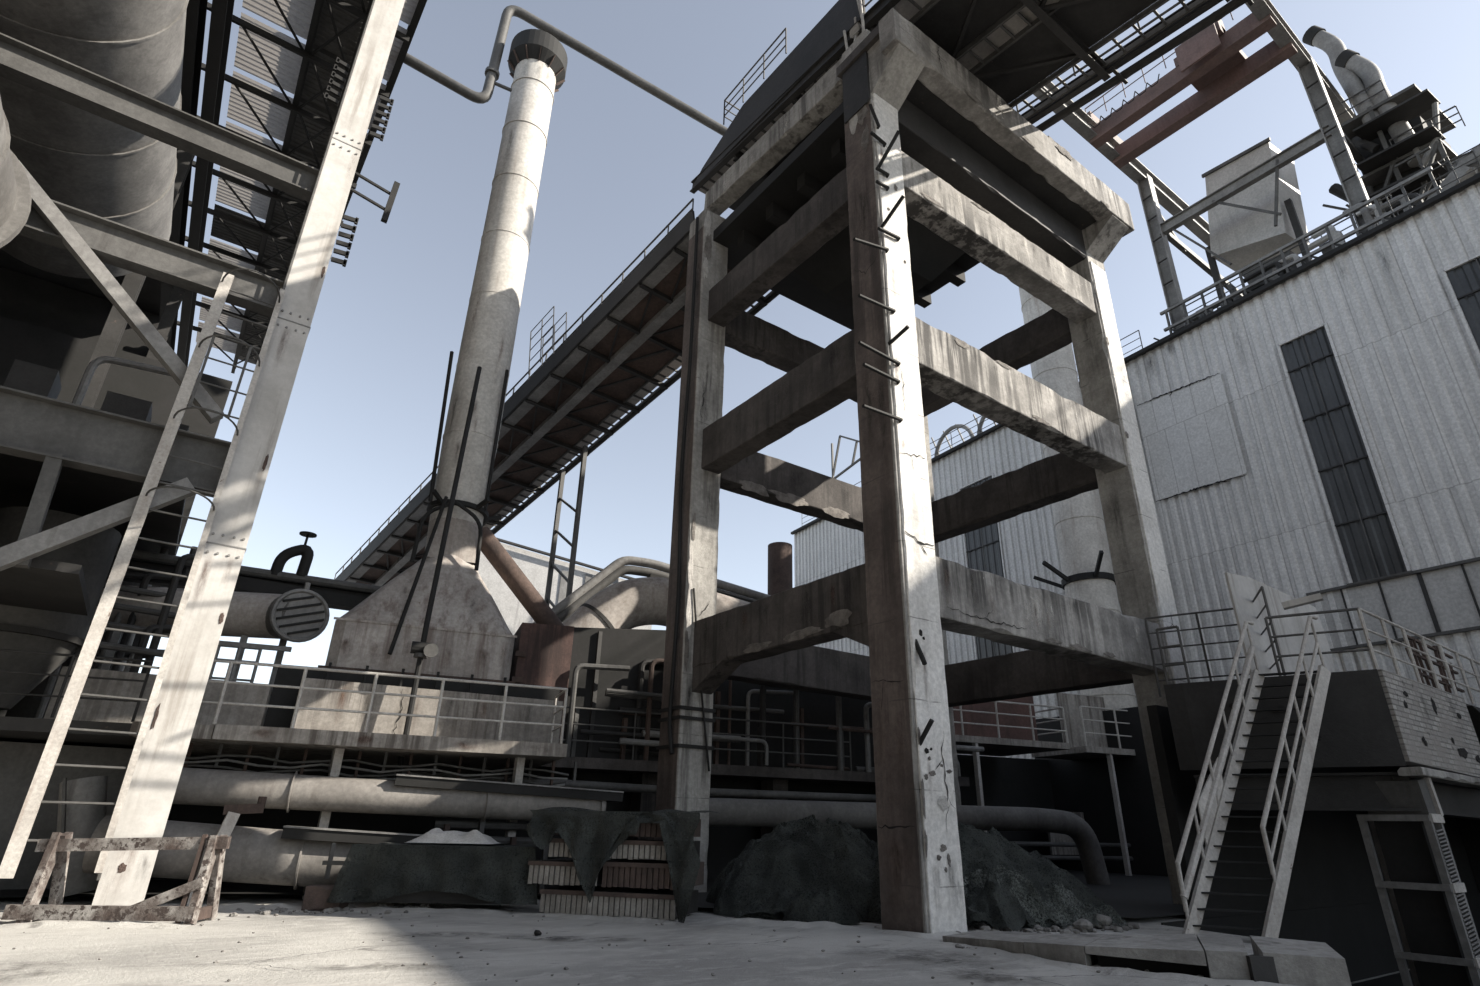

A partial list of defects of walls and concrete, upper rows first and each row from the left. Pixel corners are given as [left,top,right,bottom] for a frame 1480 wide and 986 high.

spalling [918,727,952,872]
spalling [1451,738,1480,763]